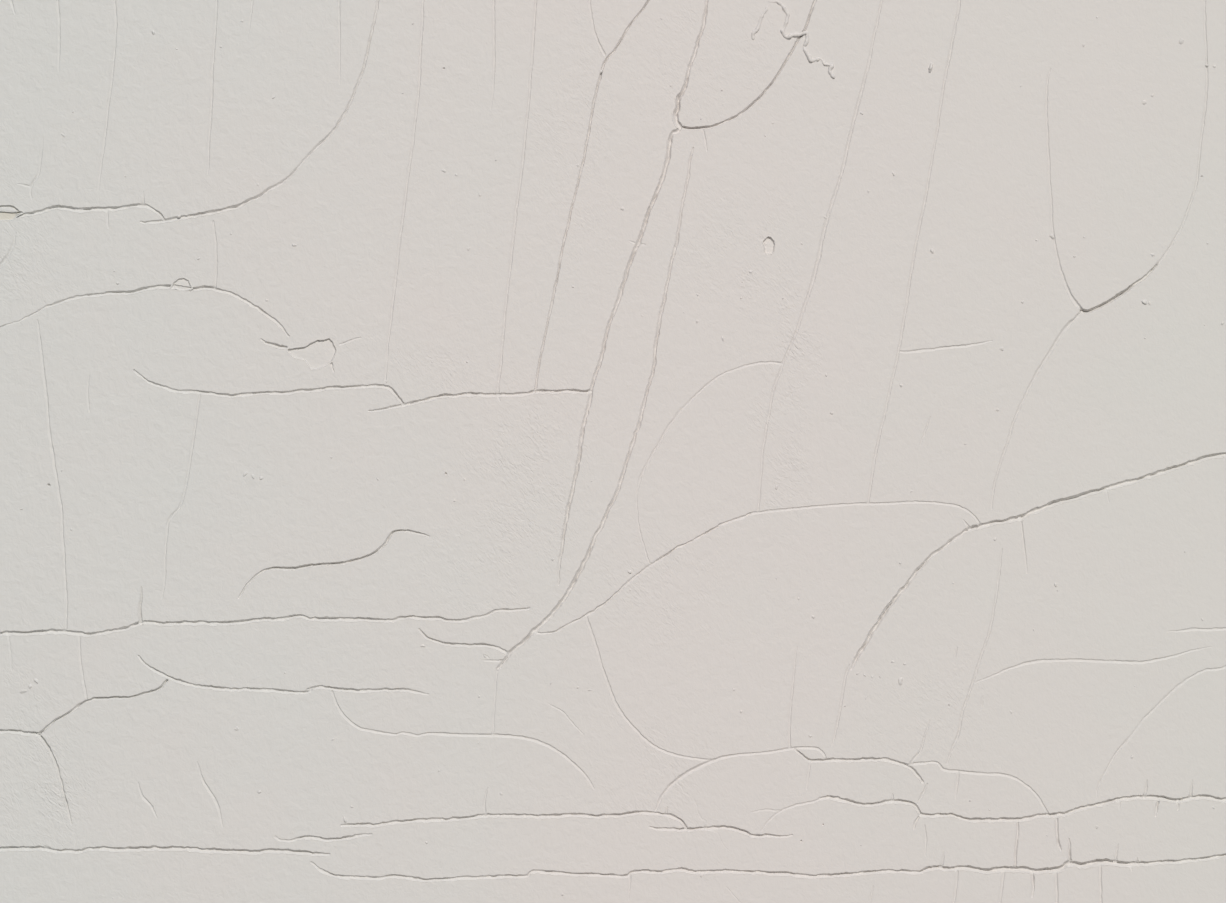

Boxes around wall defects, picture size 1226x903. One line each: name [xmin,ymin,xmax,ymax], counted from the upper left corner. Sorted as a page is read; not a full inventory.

crack [0,0,380,338]
crack [0,147,694,828]
crack [132,0,817,599]
crack [310,0,1226,903]
crack [0,845,331,857]
crack [274,833,373,843]